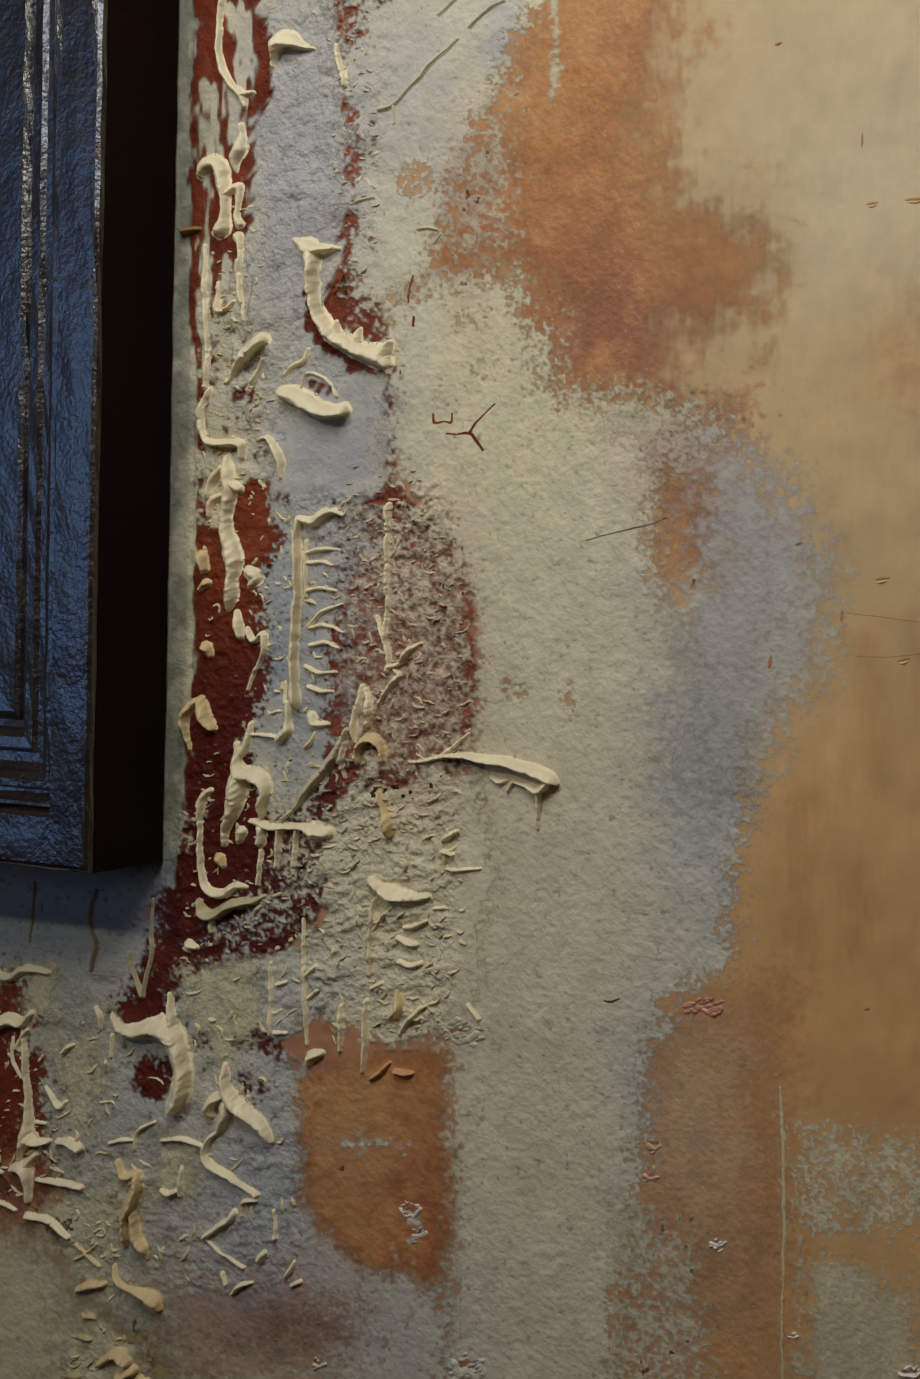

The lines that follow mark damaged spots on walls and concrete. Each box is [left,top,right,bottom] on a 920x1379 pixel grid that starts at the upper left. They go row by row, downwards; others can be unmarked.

rust [428,0,764,410]
crack [432,403,496,451]
peeling [0,973,35,1016]
peeling [0,1027,24,1217]
peeling [407,1217,422,1227]
spalling [707,1235,727,1252]